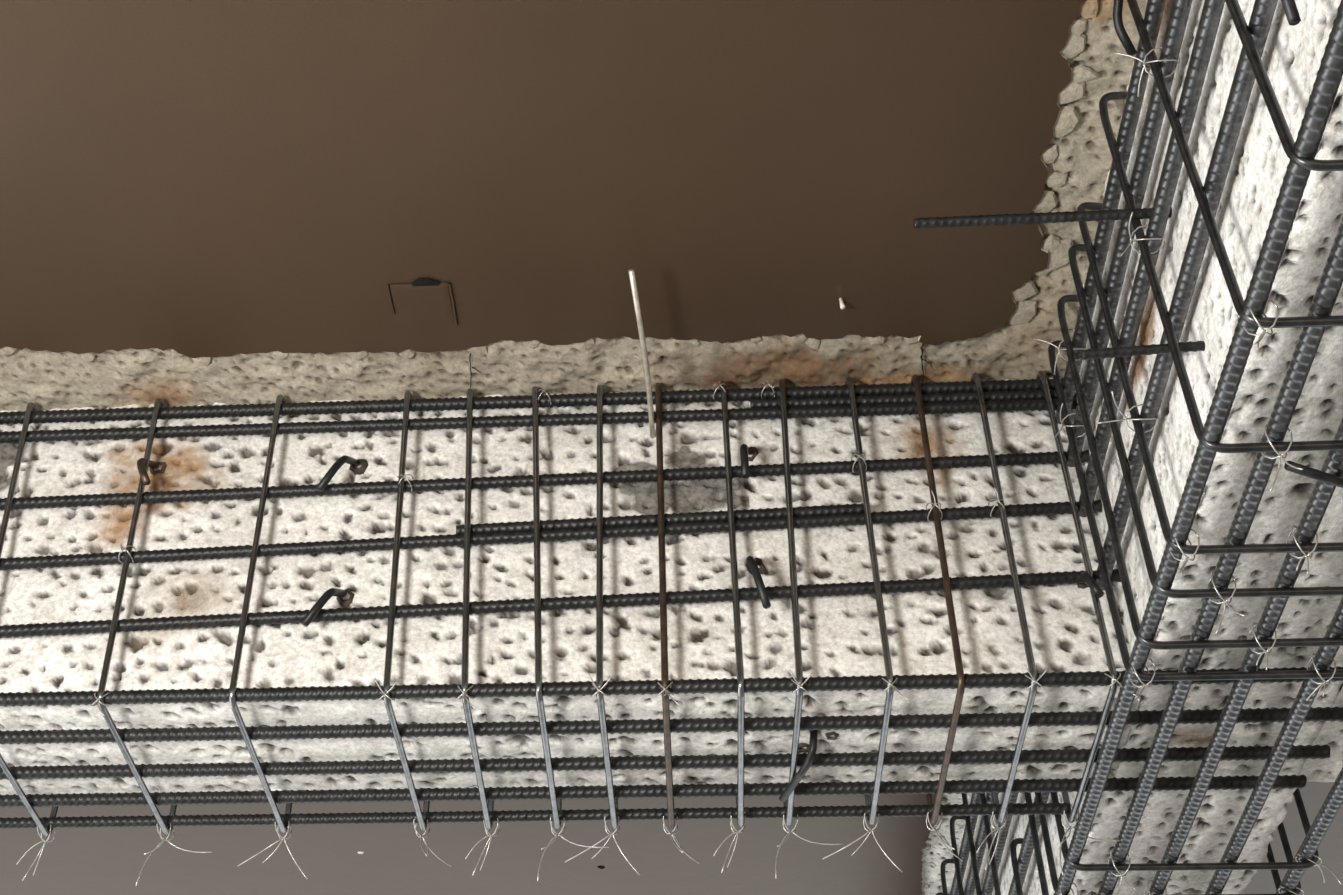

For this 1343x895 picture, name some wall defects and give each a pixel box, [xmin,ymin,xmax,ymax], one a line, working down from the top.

corrosion [704,349,963,387]
spalling [0,430,27,495]
corrosion [119,449,197,511]
spalling [612,438,749,515]
spalling [922,793,972,895]